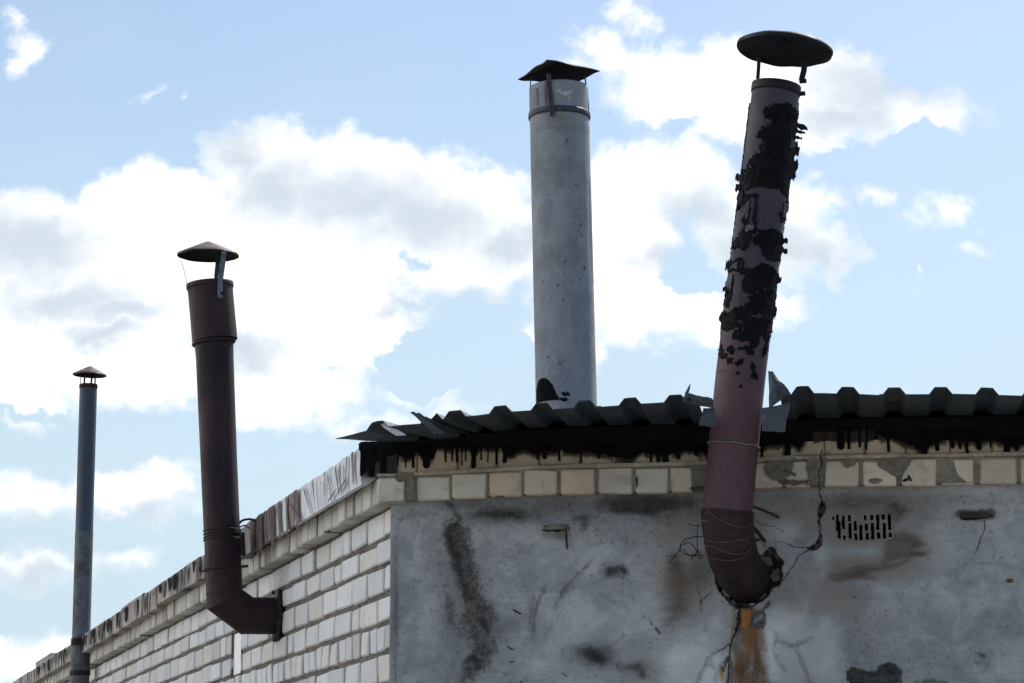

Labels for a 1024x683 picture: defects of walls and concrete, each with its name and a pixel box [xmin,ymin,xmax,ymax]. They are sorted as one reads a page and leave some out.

damp [290,449,358,520]
crack [781,450,830,581]
damp [29,554,205,683]
crack [719,605,743,683]
rust [720,608,767,683]
spalling [847,662,903,683]